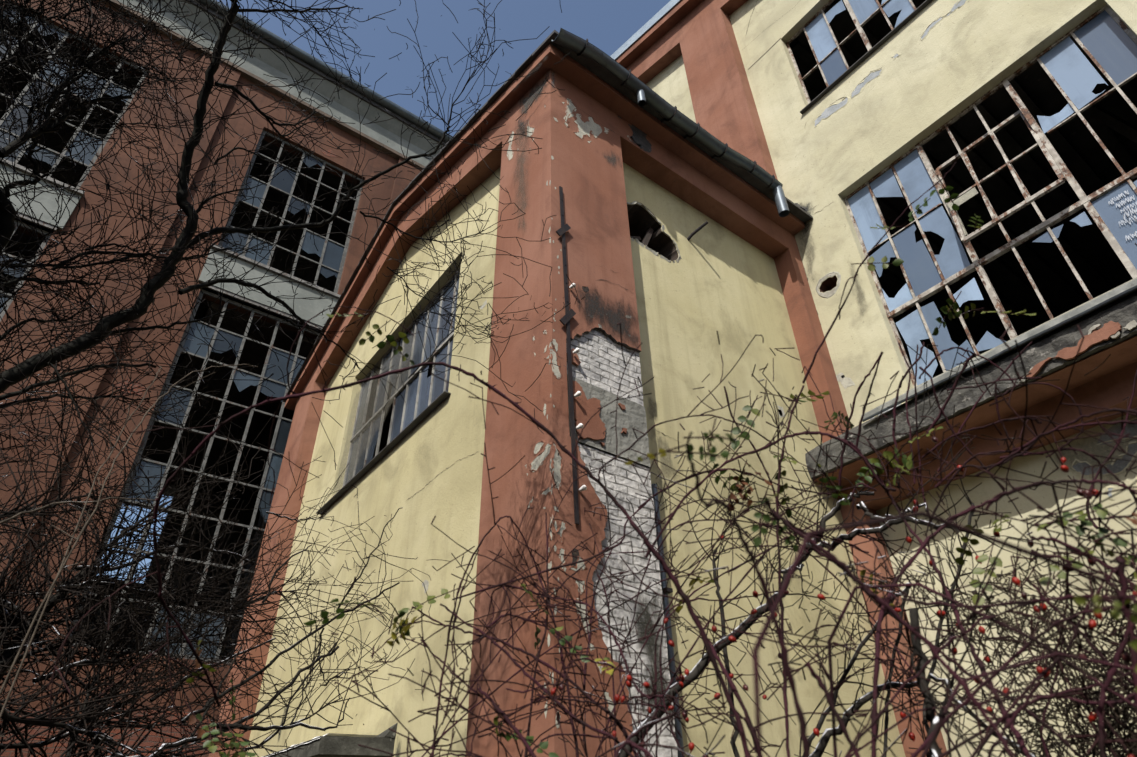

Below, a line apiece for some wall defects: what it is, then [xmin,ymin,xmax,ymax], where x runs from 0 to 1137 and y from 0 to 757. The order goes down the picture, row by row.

peeling [544,98,611,143]
spalling [627,201,682,263]
spalling [816,272,841,298]
damp [578,290,638,343]
peeling [1019,320,1137,382]
spalling [526,299,678,757]